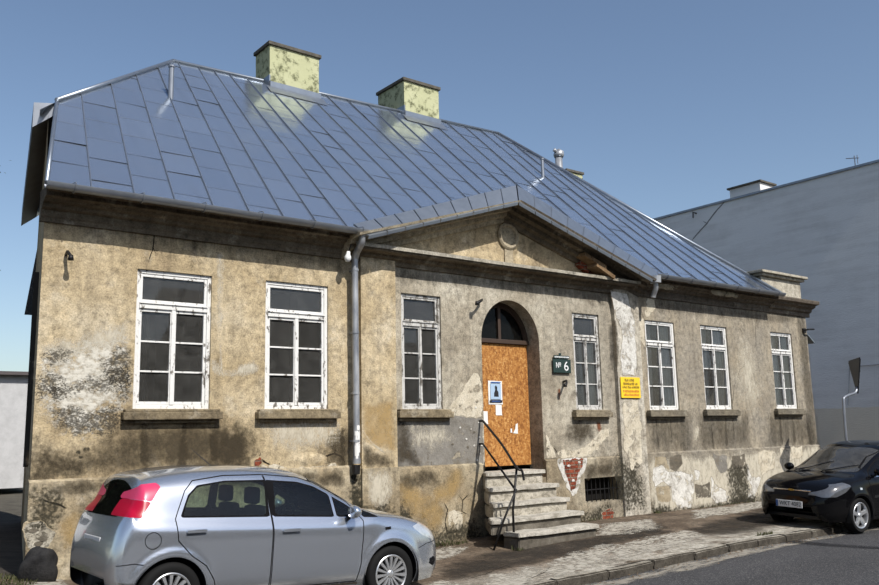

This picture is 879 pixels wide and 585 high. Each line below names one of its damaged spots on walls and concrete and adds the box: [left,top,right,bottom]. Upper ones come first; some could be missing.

peeling [610,290,656,376]
peeling [449,372,484,448]
spalling [545,428,610,497]
peeling [622,399,643,471]
peeling [652,445,803,509]
damp [702,464,761,508]